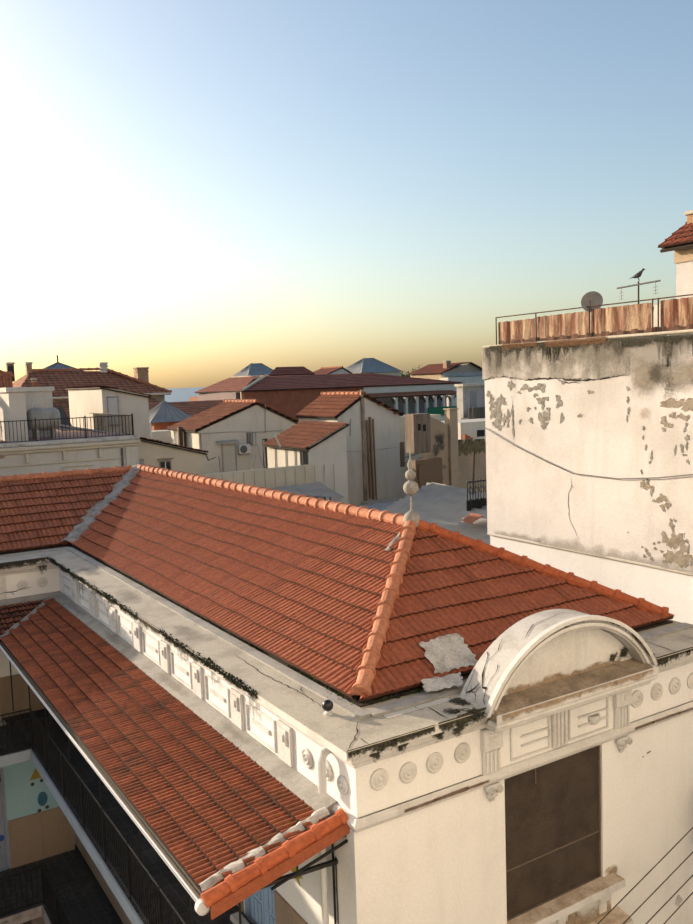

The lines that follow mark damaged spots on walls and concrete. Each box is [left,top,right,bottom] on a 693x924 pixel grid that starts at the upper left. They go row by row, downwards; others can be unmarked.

water stain [485,334,693,396]
peeling [486,379,566,438]
peeling [659,397,693,464]
peeling [640,426,693,569]
crack [466,638,503,704]
water stain [347,697,487,761]
water stain [566,904,611,924]